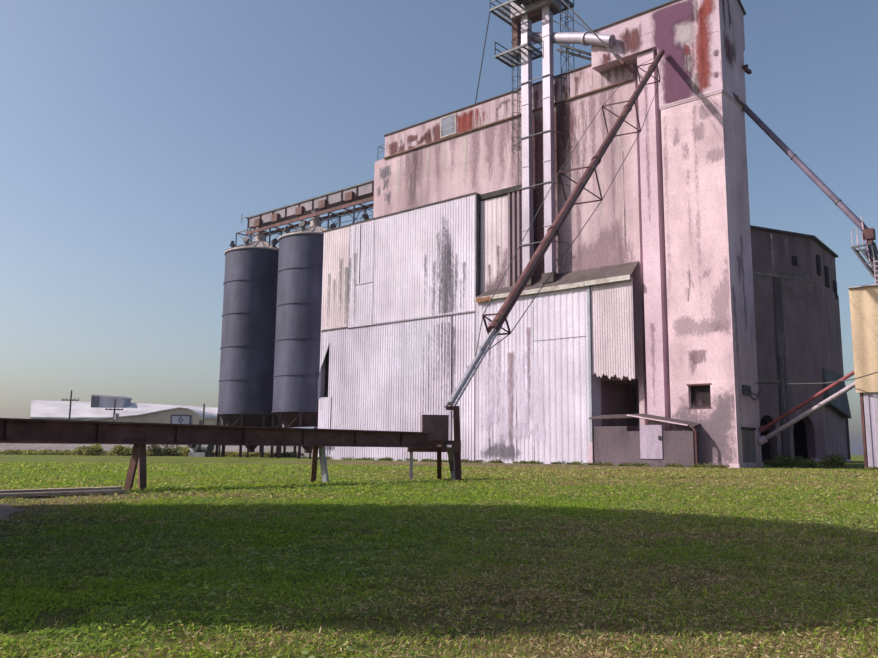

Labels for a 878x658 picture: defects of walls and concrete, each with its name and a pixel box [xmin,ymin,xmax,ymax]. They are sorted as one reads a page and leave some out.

water stain [328,253,356,323]
water stain [422,216,465,394]
water stain [673,237,770,360]
water stain [482,335,519,461]